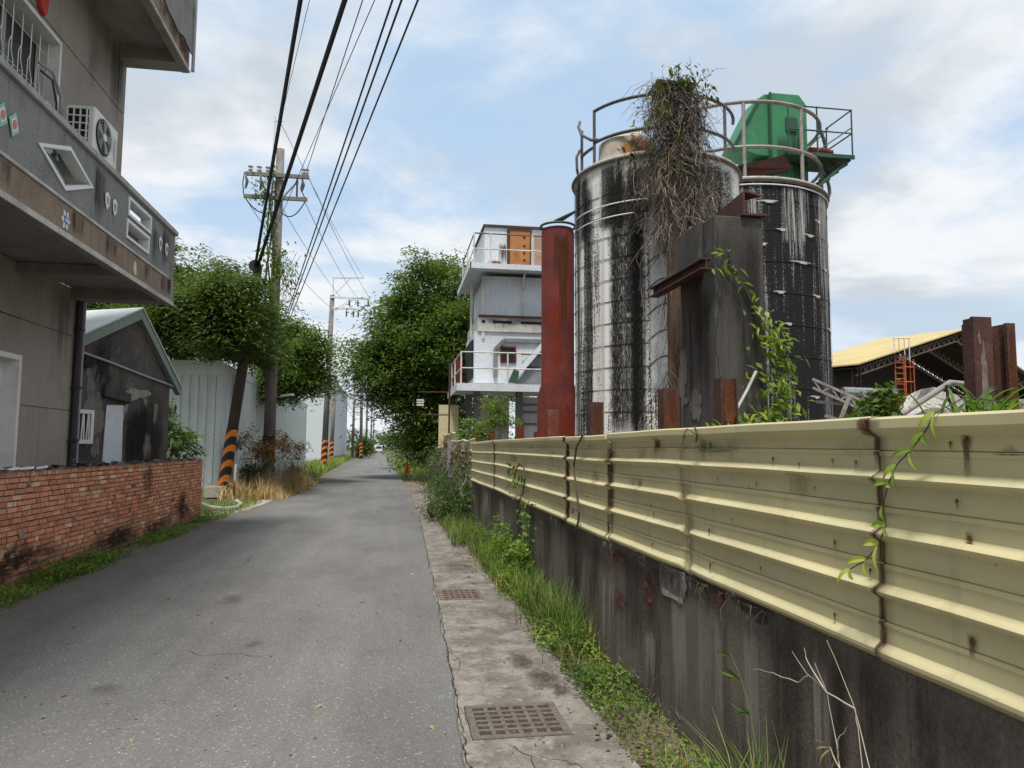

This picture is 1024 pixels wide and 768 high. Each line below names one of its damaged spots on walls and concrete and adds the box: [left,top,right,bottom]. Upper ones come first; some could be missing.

leakage [784,190,830,274]
rust [534,234,568,315]
leakage [574,162,655,431]
flaking render [123,388,151,420]
rust [948,435,970,467]
leakage [0,546,50,580]
rust [856,418,886,661]